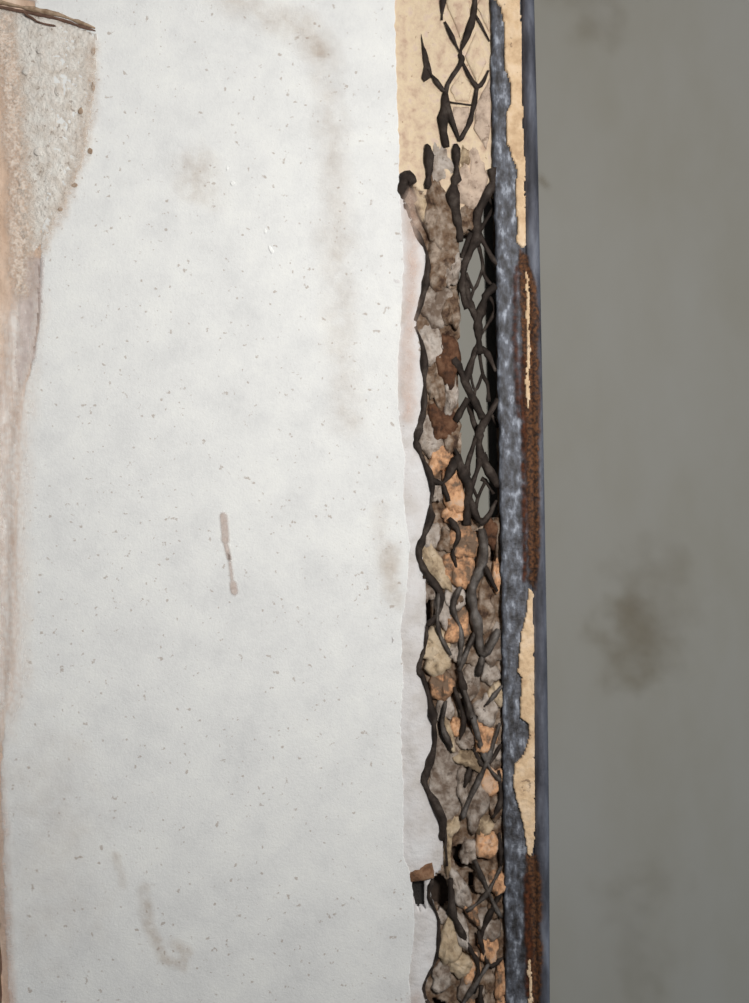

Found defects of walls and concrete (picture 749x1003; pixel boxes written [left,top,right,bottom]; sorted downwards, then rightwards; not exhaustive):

peeling [0,0,98,434]
flaking render [390,0,506,1003]
rust [513,250,541,587]
flaking render [0,715,10,1003]
rust [524,854,543,1003]